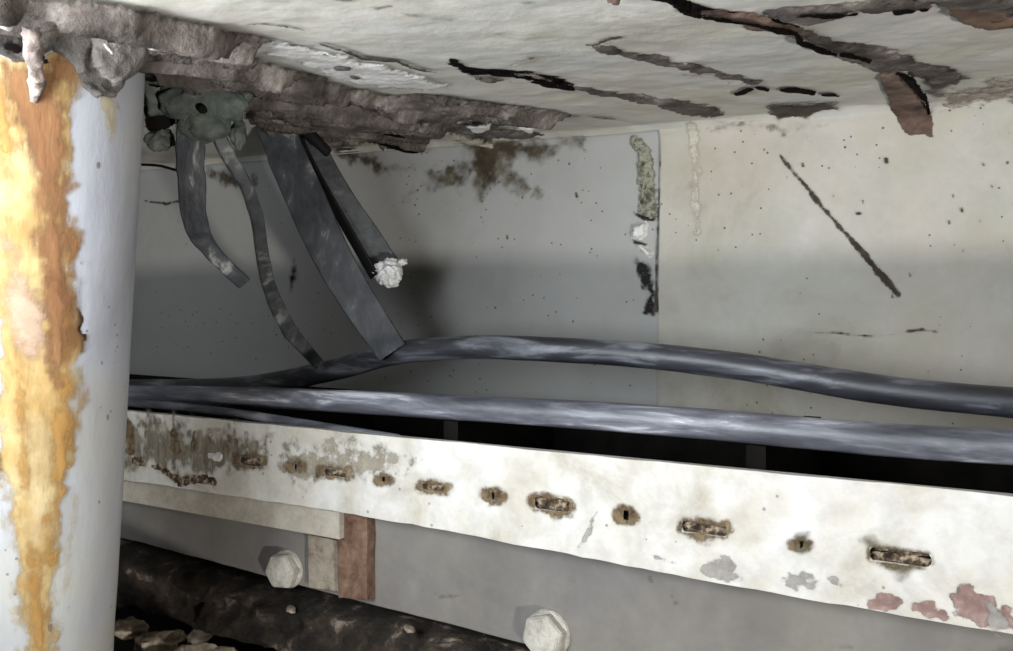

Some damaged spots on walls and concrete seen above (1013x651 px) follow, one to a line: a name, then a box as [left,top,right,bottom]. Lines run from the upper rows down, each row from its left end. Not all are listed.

spalling [0,0,579,154]
crack [248,23,724,118]
crack [651,0,961,137]
damp [334,144,386,172]
crack [780,155,900,297]
corrosion [0,52,86,651]
damp [126,419,146,455]
damp [278,437,398,483]
corrosion [682,518,727,542]
peeling [700,555,739,582]
corrosion [867,540,932,574]
peeling [867,584,1013,637]